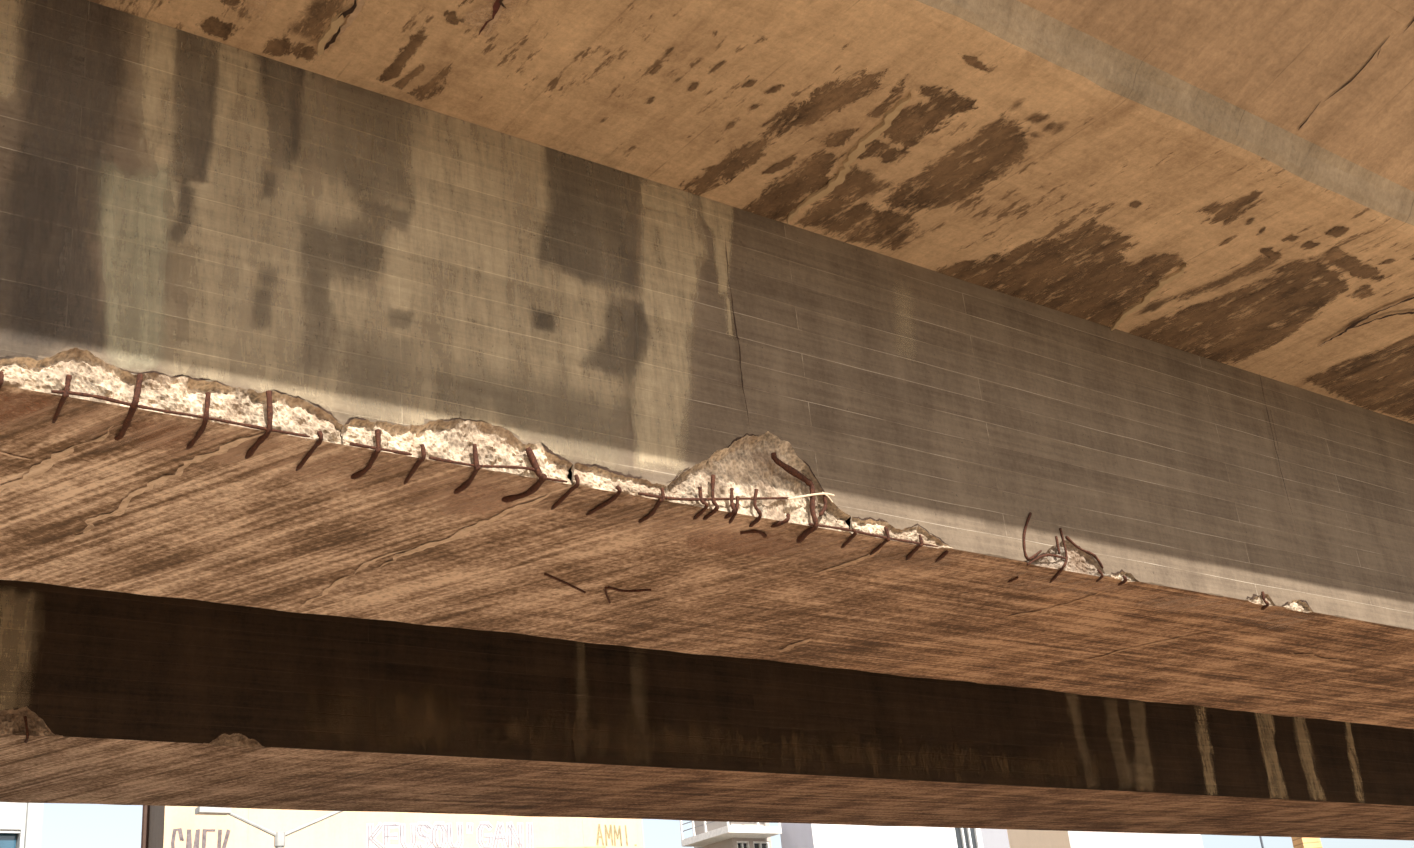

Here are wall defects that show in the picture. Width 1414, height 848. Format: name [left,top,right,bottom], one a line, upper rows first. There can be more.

crack [323,0,365,54]
crack [479,0,512,37]
crack [1299,20,1414,130]
damp [0,0,733,465]
spalling [0,348,953,562]
spalling [1007,512,1138,586]